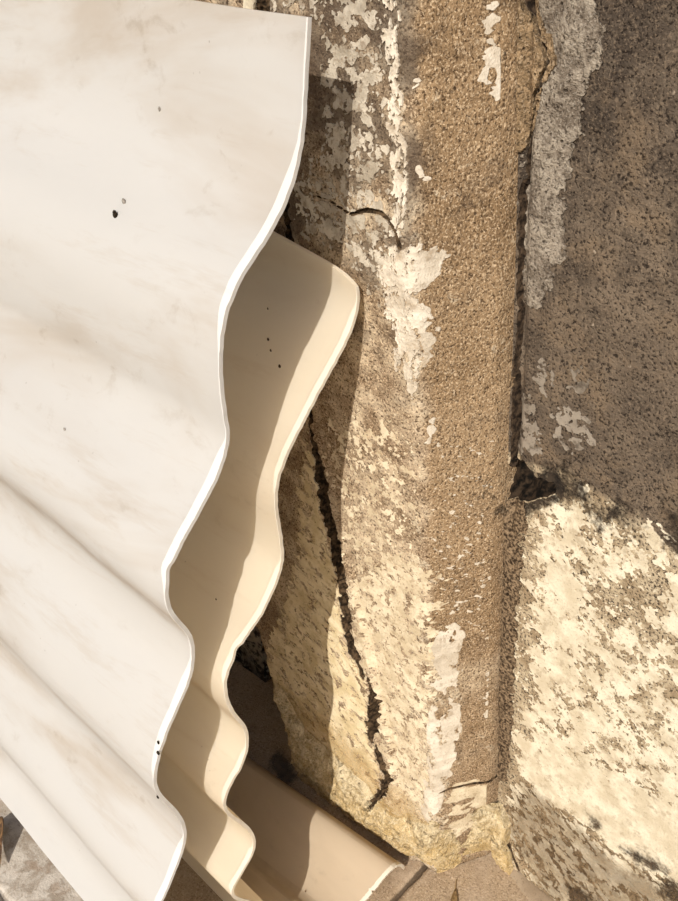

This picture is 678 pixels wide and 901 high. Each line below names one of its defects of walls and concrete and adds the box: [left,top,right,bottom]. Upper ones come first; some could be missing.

crack [256,0,270,12]
crack [284,202,294,242]
crack [317,195,402,250]
peeling [270,0,451,399]
crack [509,136,533,467]
crack [525,0,550,94]
crack [308,409,394,809]
peeling [266,358,678,901]